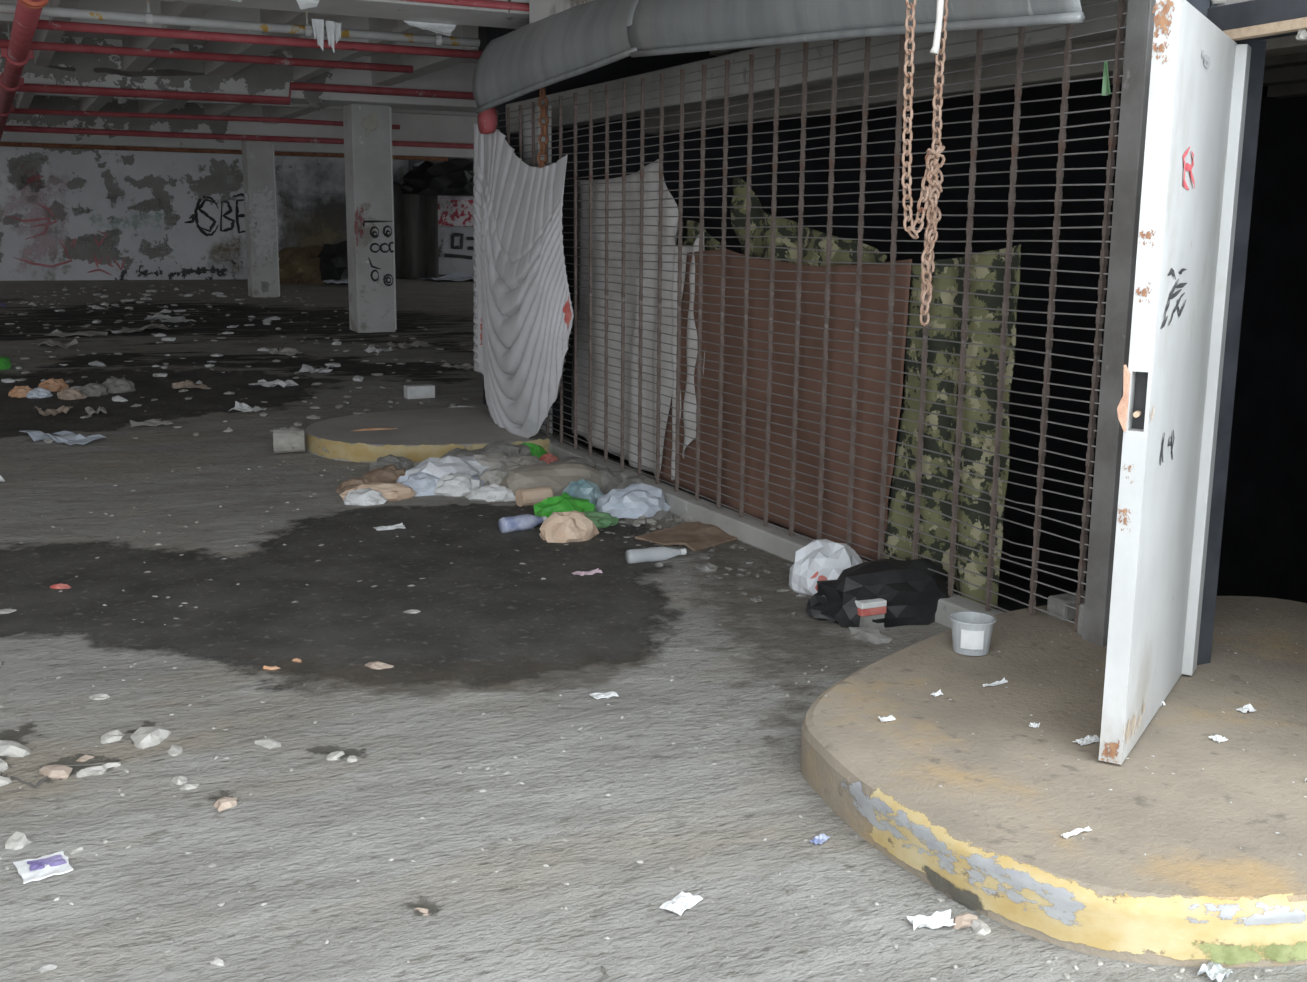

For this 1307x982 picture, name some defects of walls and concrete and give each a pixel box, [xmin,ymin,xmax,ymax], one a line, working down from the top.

peeling [296,0,341,52]
peeling [404,21,456,36]
rust [1151,0,1175,64]
peeling [0,36,332,270]
peeling [841,780,1086,926]
peeling [1187,902,1307,926]